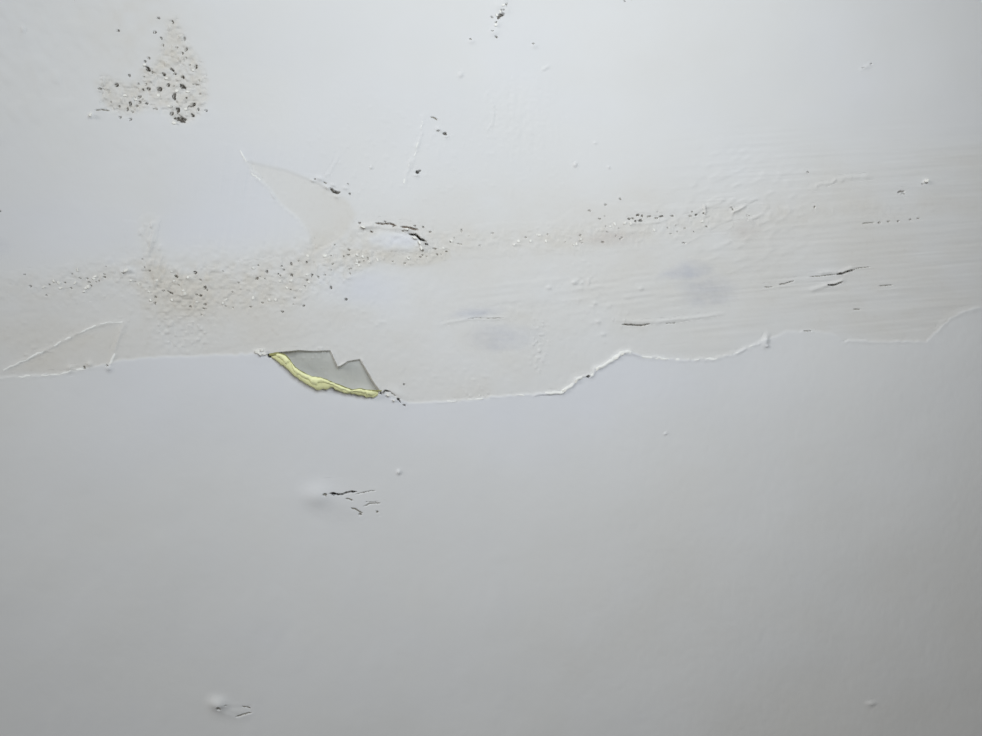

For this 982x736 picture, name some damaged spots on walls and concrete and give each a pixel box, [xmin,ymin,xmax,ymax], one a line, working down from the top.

spalling [85,12,213,127]
crack [759,262,898,314]
peeling [253,346,410,411]